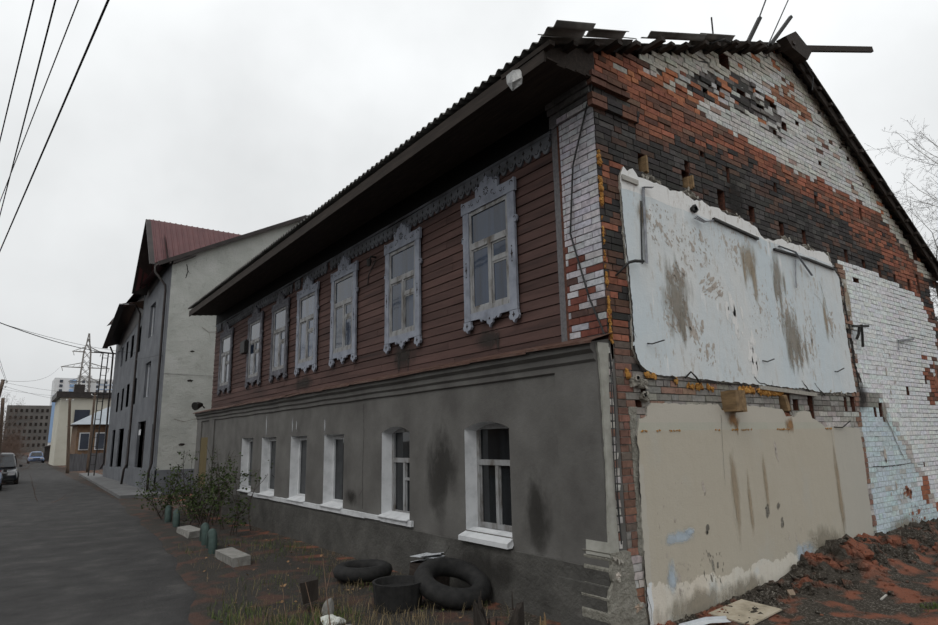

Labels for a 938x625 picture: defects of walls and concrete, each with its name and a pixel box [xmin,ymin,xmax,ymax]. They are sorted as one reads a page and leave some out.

leakage [743,249,757,297]
leakage [668,273,689,339]
leakage [774,261,808,368]
leakage [430,443,451,499]
leakage [529,487,547,542]
peeling [888,477,929,521]